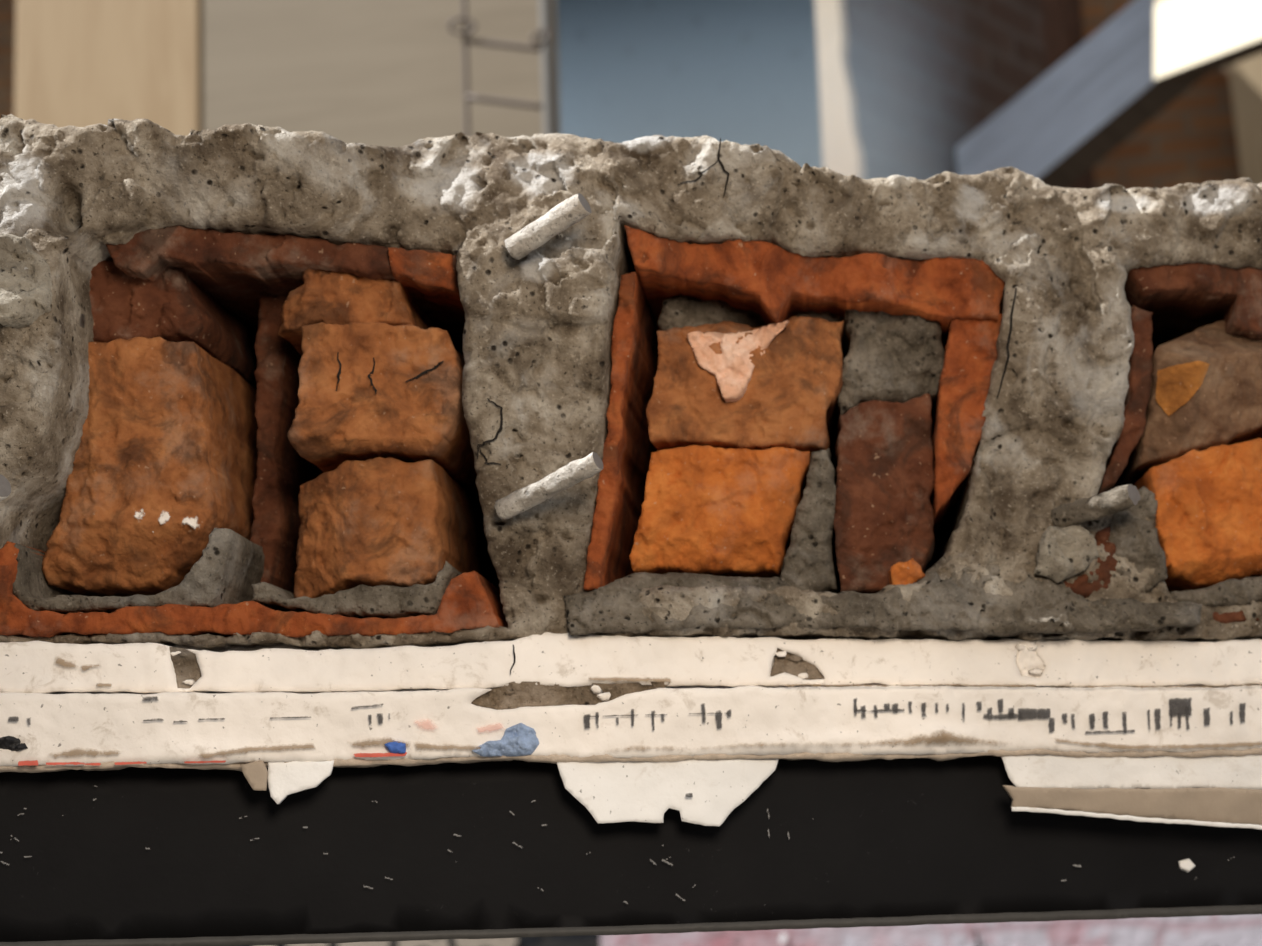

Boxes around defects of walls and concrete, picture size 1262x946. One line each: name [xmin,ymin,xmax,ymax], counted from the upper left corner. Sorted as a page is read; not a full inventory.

spalling [42,259,258,597]
spalling [278,268,490,598]
spalling [629,316,935,594]
spalling [1114,319,1262,593]
spalling [471,682,671,710]
peeling [557,758,778,826]
peeling [1001,754,1262,830]
peeling [254,938,518,946]